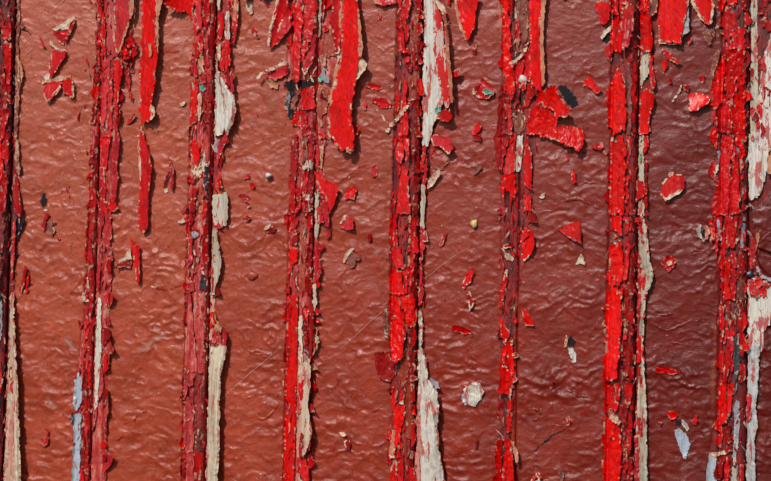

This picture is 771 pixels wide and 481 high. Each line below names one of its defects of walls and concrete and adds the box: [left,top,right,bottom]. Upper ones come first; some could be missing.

peeling [39,16,75,102]
peeling [447,0,479,55]
peeling [0,0,29,340]
peeling [69,0,453,481]
peeling [472,0,771,481]
peeling [451,325,473,335]
peeling [461,268,474,312]